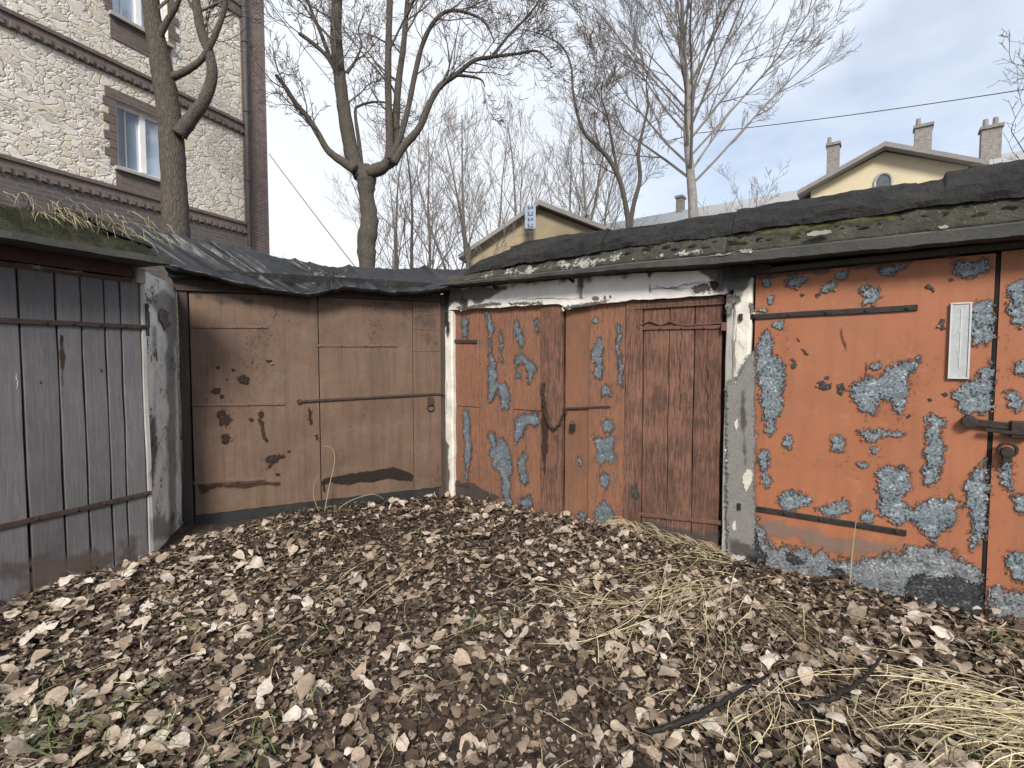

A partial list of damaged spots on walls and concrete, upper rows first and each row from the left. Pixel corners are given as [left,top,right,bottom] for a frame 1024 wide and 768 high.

peeling [949,255,993,281]
corrosion [210,388,232,445]
corrosion [198,410,291,494]
corrosion [322,467,413,492]
peeling [456,285,543,510]
peeling [562,296,625,398]
peeling [577,418,617,523]
peeling [691,264,1024,622]